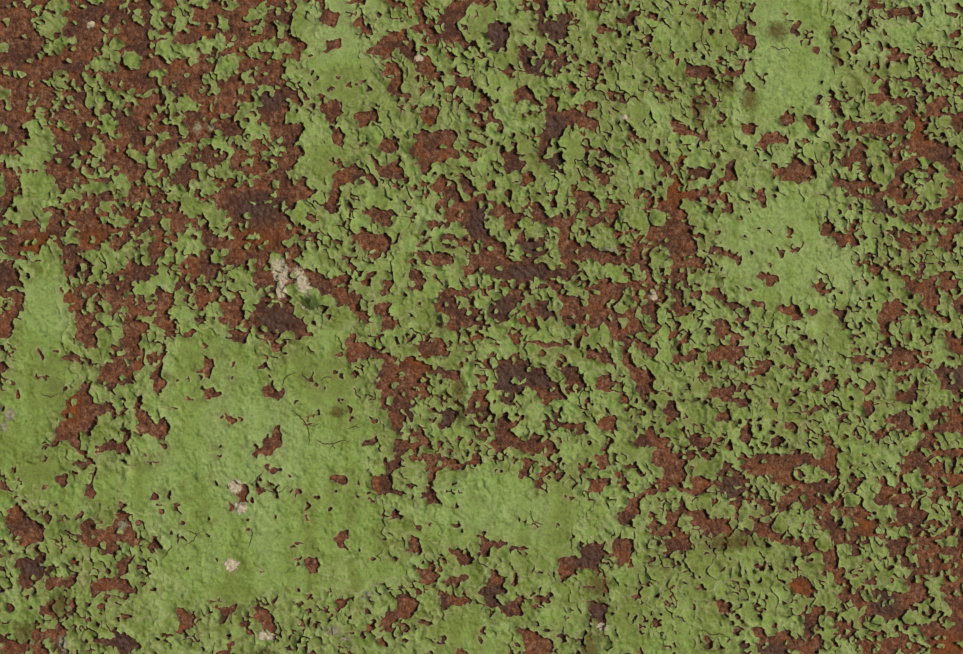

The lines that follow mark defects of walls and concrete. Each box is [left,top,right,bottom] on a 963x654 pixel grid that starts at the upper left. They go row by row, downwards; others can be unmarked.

peeling [499,0,671,104]
peeling [829,0,924,69]
peeling [317,93,346,147]
peeling [741,122,789,162]
peeling [771,138,824,184]
corrosion [25,235,51,255]
corrosion [406,354,428,370]
peeling [95,393,171,455]
peeling [252,425,283,480]
peeling [0,469,554,654]
peeling [509,621,569,654]
peeling [698,579,768,654]